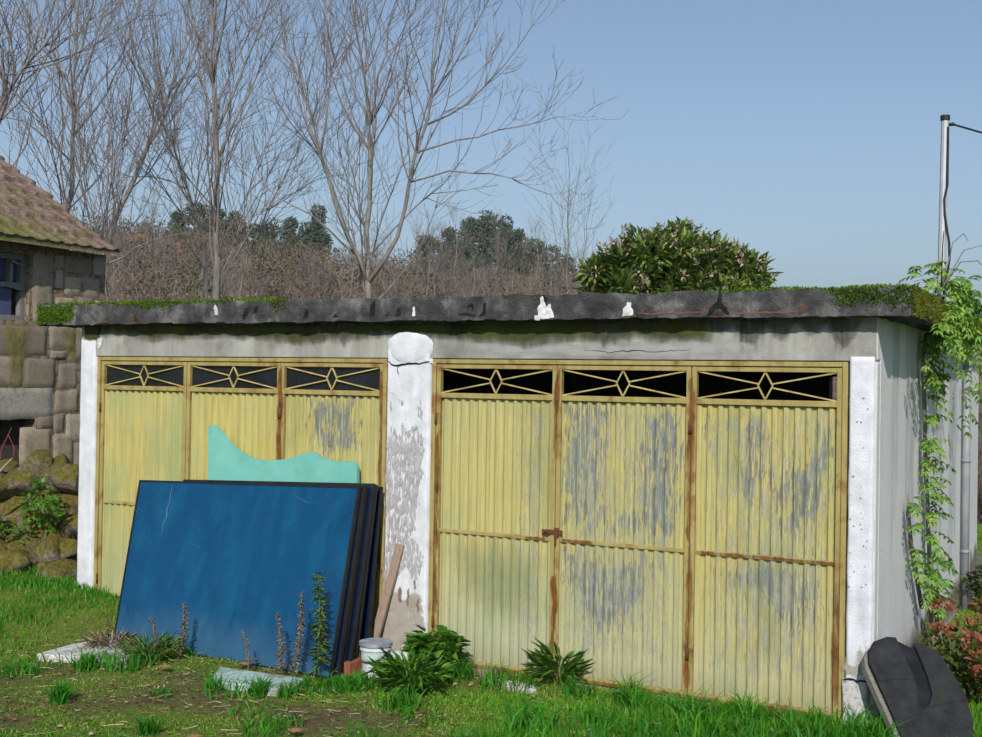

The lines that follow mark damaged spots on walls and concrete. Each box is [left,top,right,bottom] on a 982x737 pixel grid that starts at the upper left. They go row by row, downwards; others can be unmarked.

crack [584,347,689,355]
water stain [475,319,859,357]
peeling [305,396,362,454]
corrosion [687,379,695,497]
peeling [382,401,425,653]
peeling [560,401,684,664]
corrosion [687,551,835,593]
peeling [702,407,836,689]
corrosion [643,659,695,697]